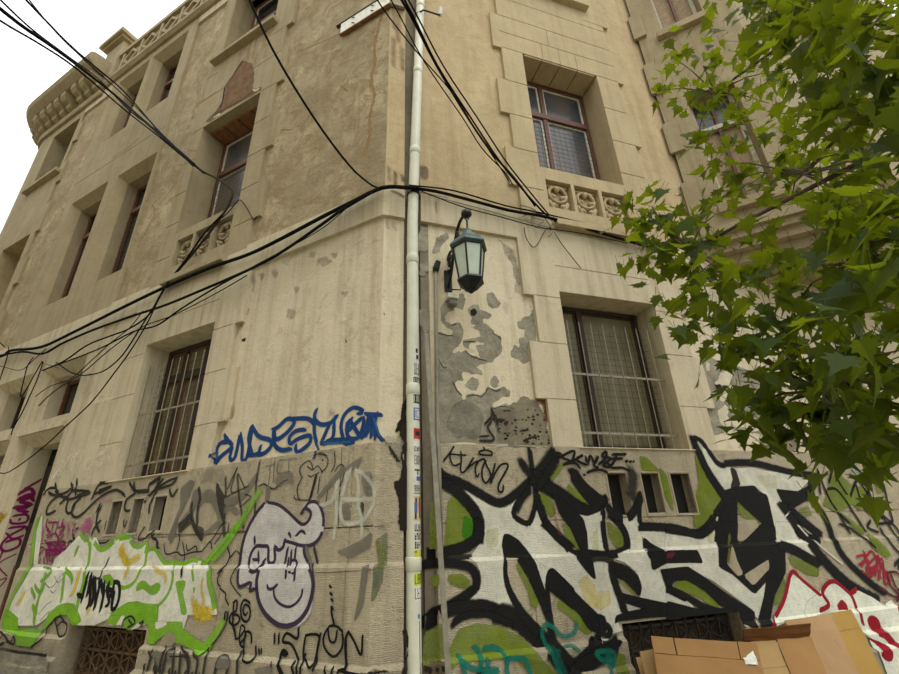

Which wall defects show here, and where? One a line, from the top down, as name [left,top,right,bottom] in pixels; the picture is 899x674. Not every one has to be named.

flaking render [206,61,261,145]
peeling [418,226,449,276]
peeling [419,292,550,449]